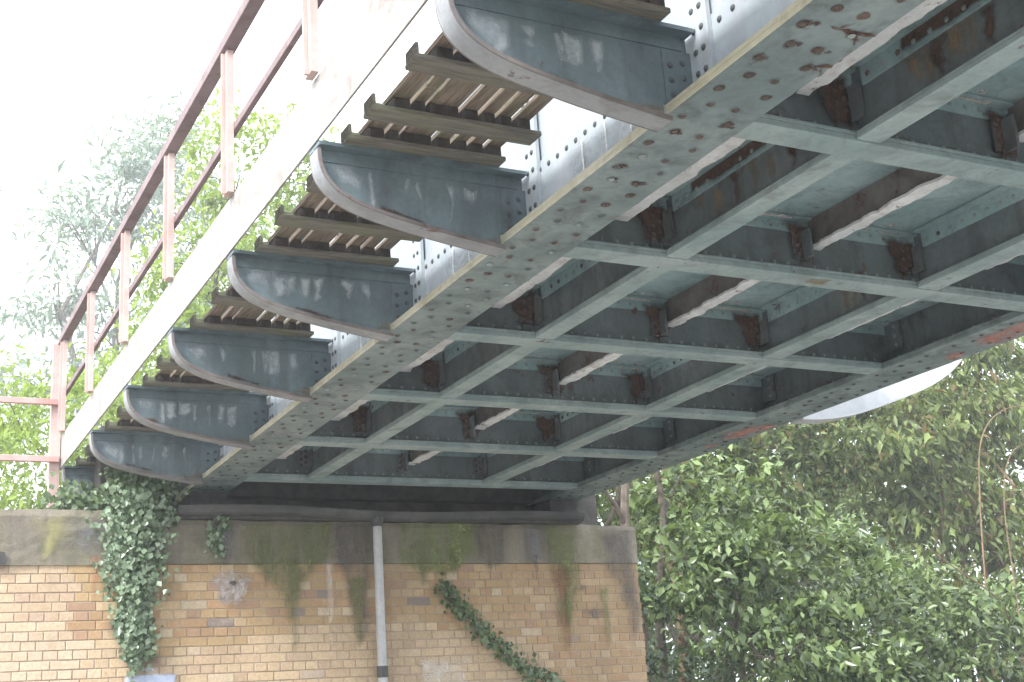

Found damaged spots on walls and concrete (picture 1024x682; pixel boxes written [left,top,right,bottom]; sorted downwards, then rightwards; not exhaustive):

corrosion [901,0,995,75]
corrosion [784,41,852,128]
corrosion [691,140,766,206]
corrosion [638,205,664,246]
corrosion [885,239,914,280]
corrosion [733,314,761,348]
corrosion [350,406,369,436]
spalling [215,573,249,603]